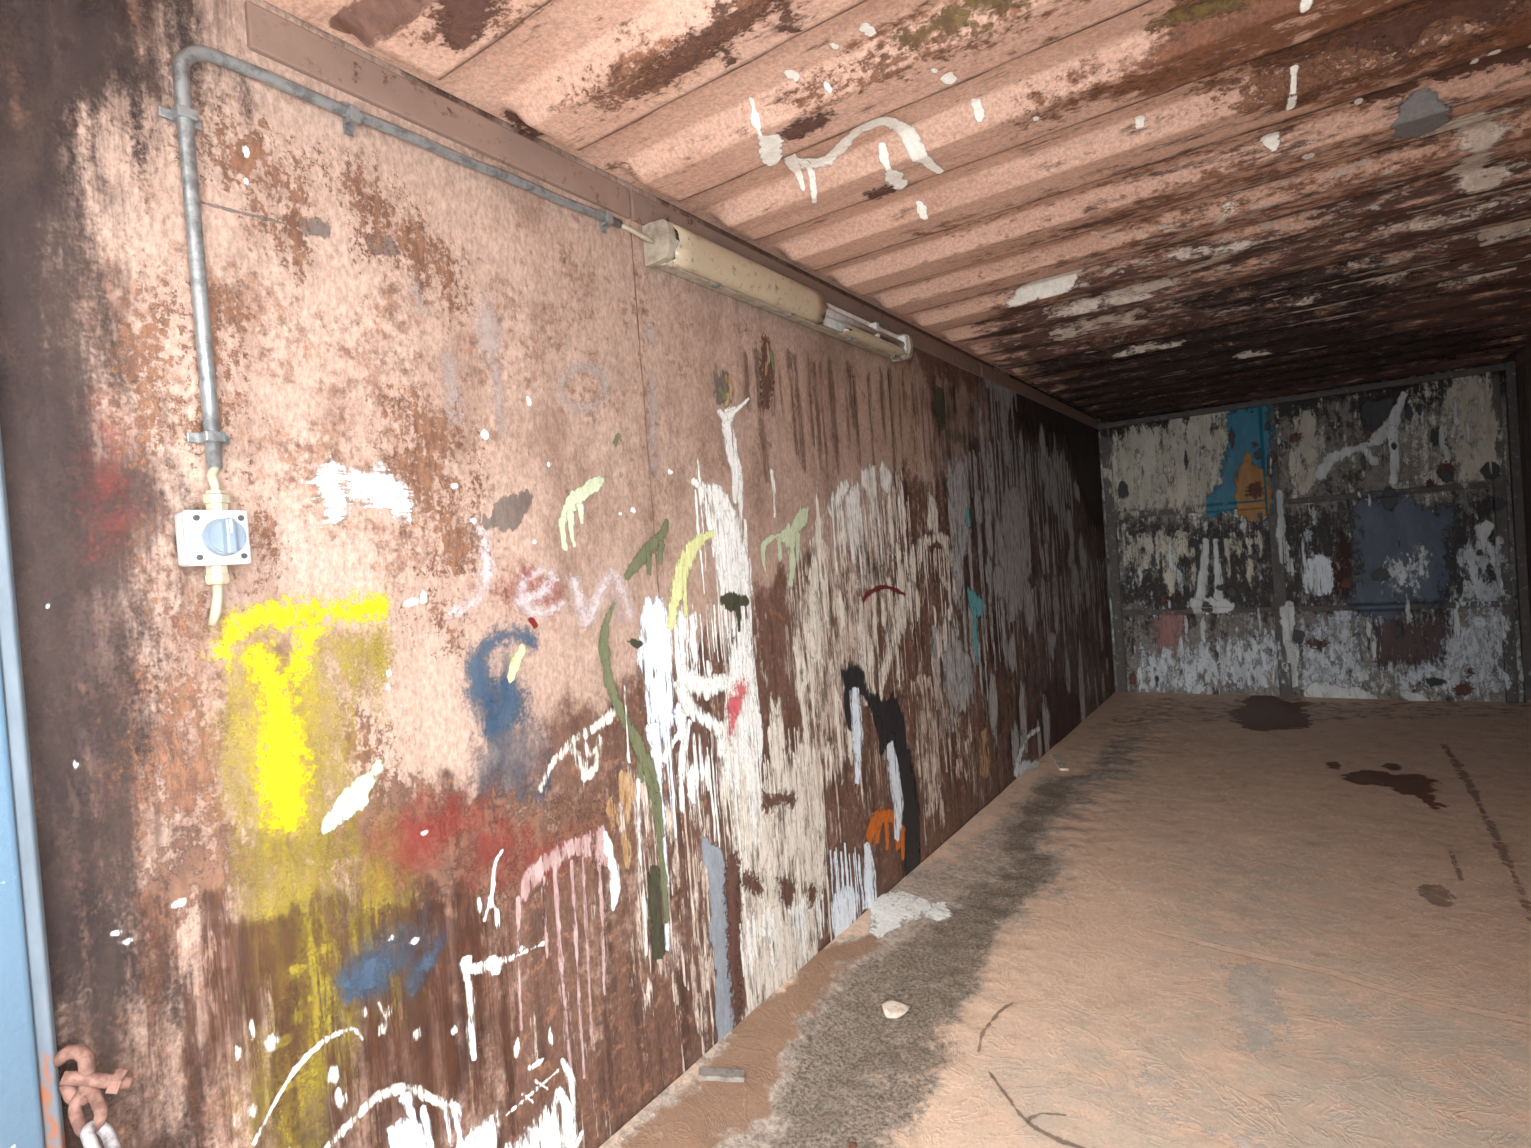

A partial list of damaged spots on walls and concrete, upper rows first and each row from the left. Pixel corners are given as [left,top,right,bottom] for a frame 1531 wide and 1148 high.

corrosion [385,0,548,54]
corrosion [555,0,813,122]
peeling [1378,183,1531,234]
peeling [1048,287,1214,320]
peeling [1112,340,1185,359]
peeling [1256,258,1531,350]
peeling [1102,411,1235,545]
peeling [1430,372,1507,510]
peeling [1401,528,1524,701]
peeling [1127,629,1323,696]
water stain [829,686,921,925]
water stain [1327,762,1447,810]